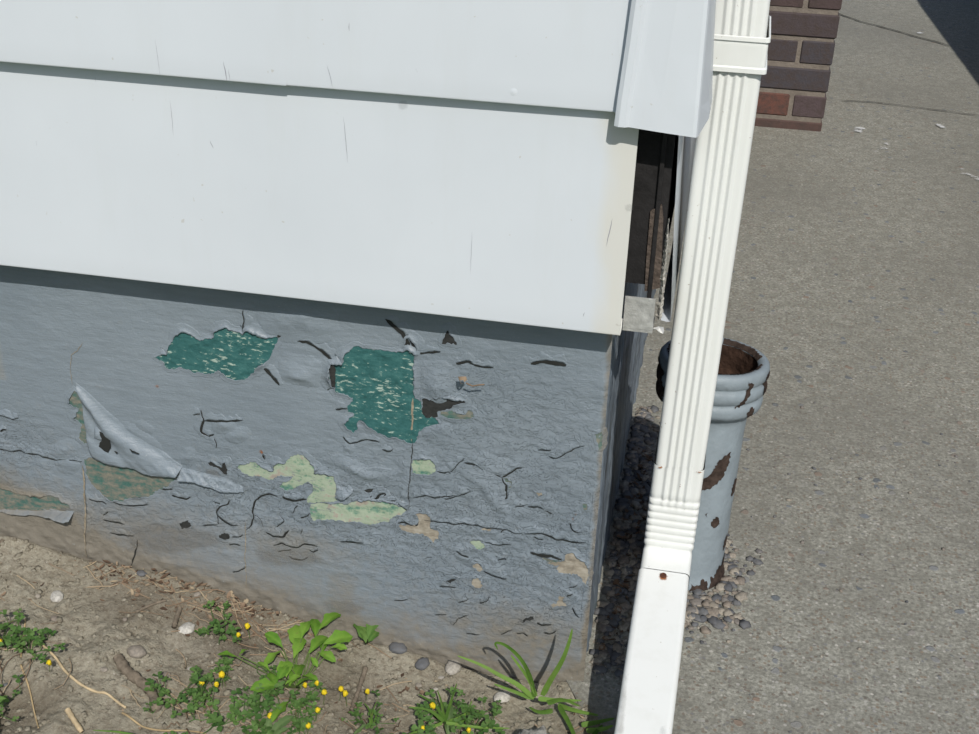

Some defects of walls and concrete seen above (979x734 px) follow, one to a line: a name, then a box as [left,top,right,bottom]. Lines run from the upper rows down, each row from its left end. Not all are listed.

peeling [150,319,283,385]
crack [385,316,494,368]
peeling [438,322,462,349]
crack [529,351,567,366]
peeling [320,329,480,479]
peeling [64,386,443,545]
peeling [0,484,78,523]
spalling [537,548,594,588]